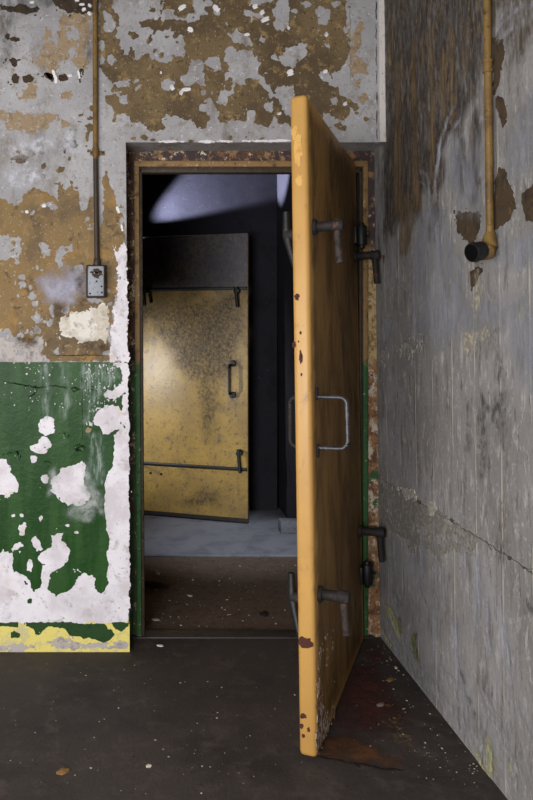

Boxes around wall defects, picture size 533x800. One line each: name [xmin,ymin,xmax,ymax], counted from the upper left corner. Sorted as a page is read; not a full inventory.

peeling [0,105,132,624]